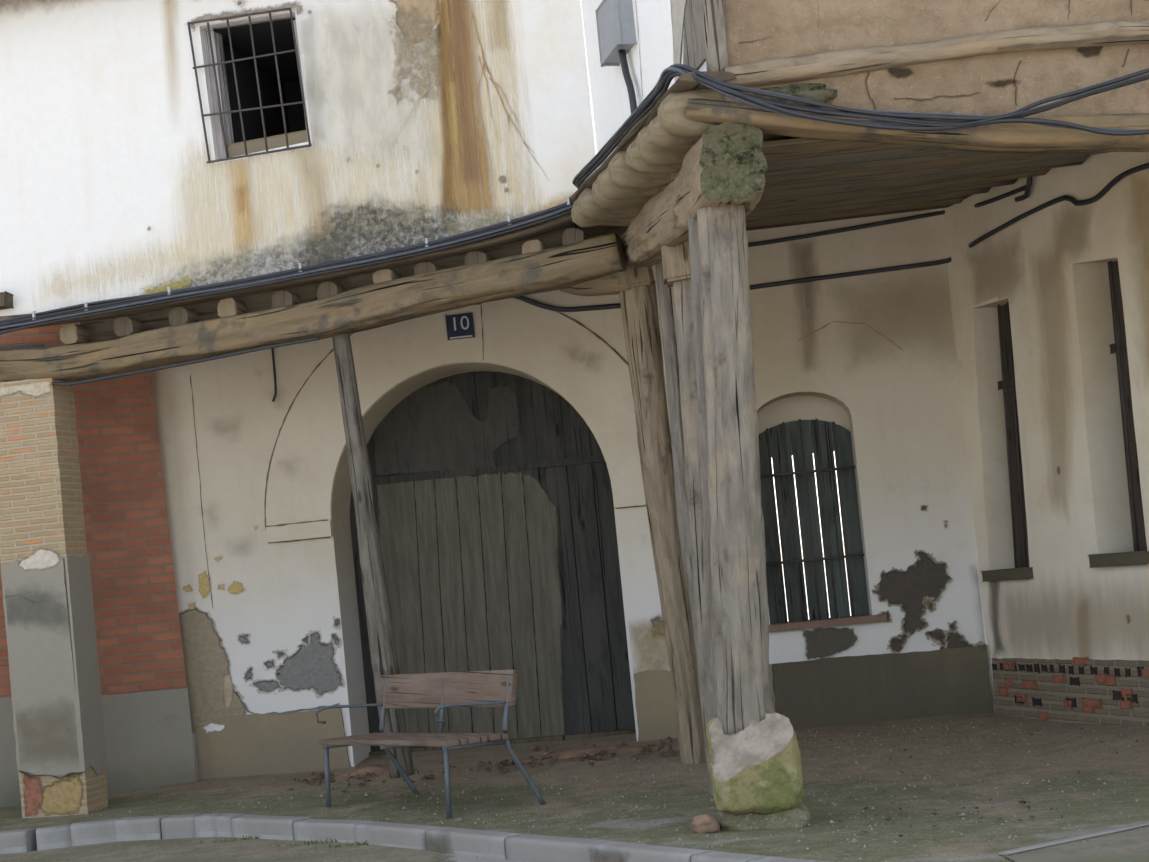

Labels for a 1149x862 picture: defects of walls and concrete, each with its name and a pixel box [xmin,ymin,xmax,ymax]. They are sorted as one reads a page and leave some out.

damp [55,0,536,294]
spalling [388,0,440,100]
crack [471,12,550,182]
spalling [19,548,59,570]
spalling [179,572,345,733]
peeling [803,628,857,659]
peeling [872,549,986,653]
spalling [24,774,83,816]